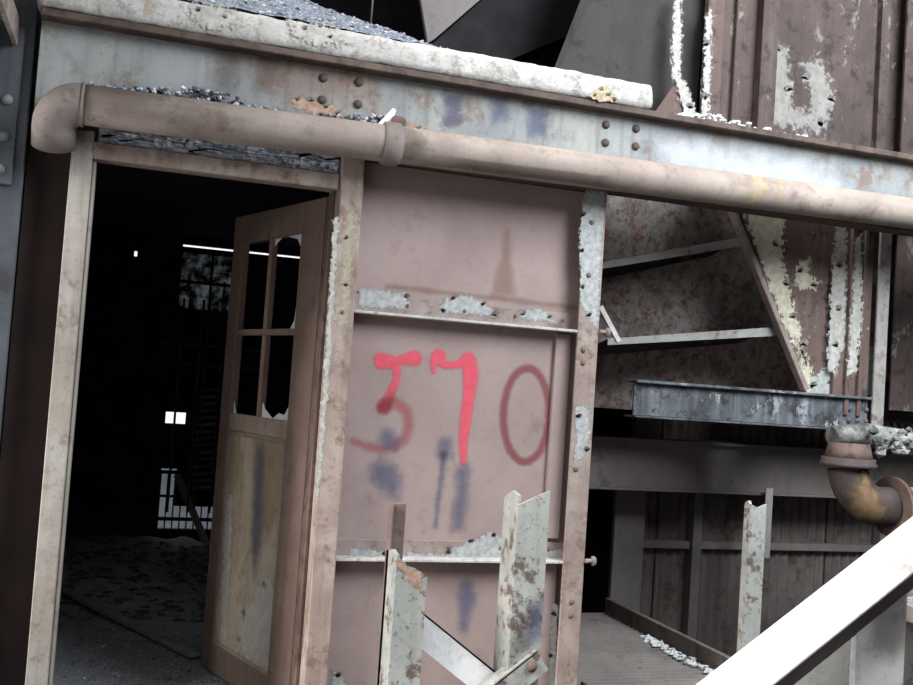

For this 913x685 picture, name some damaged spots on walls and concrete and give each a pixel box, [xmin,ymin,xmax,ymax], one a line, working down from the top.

peeling [670,0,714,119]
peeling [774,41,837,140]
peeling [438,294,499,318]
peeling [519,308,557,324]
peeling [578,189,608,331]
peeling [741,213,874,397]
peeling [573,405,592,463]
corrosion [850,470,885,523]
peeling [219,491,275,671]
corrosion [394,560,423,592]